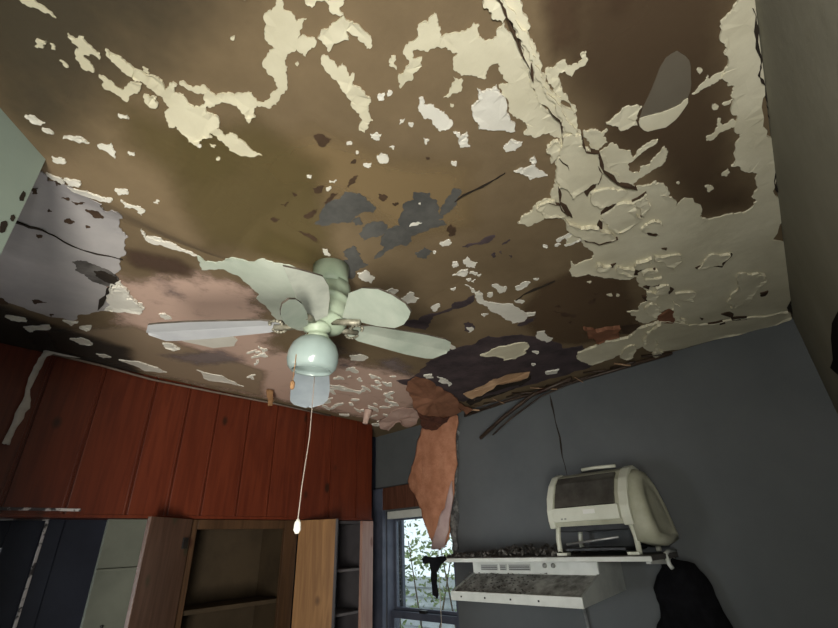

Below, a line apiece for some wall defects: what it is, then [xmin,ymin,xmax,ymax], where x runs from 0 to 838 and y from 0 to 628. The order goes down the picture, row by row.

peeling [20,0,56,18]
peeling [35,38,56,50]
crack [498,0,534,83]
peeling [24,115,116,158]
crack [548,108,637,190]
leakage [577,0,739,208]
crack [15,221,123,260]
peeling [0,171,167,373]
crack [98,286,112,310]
leakage [140,123,467,264]
peeling [59,0,792,426]
crack [549,187,573,218]